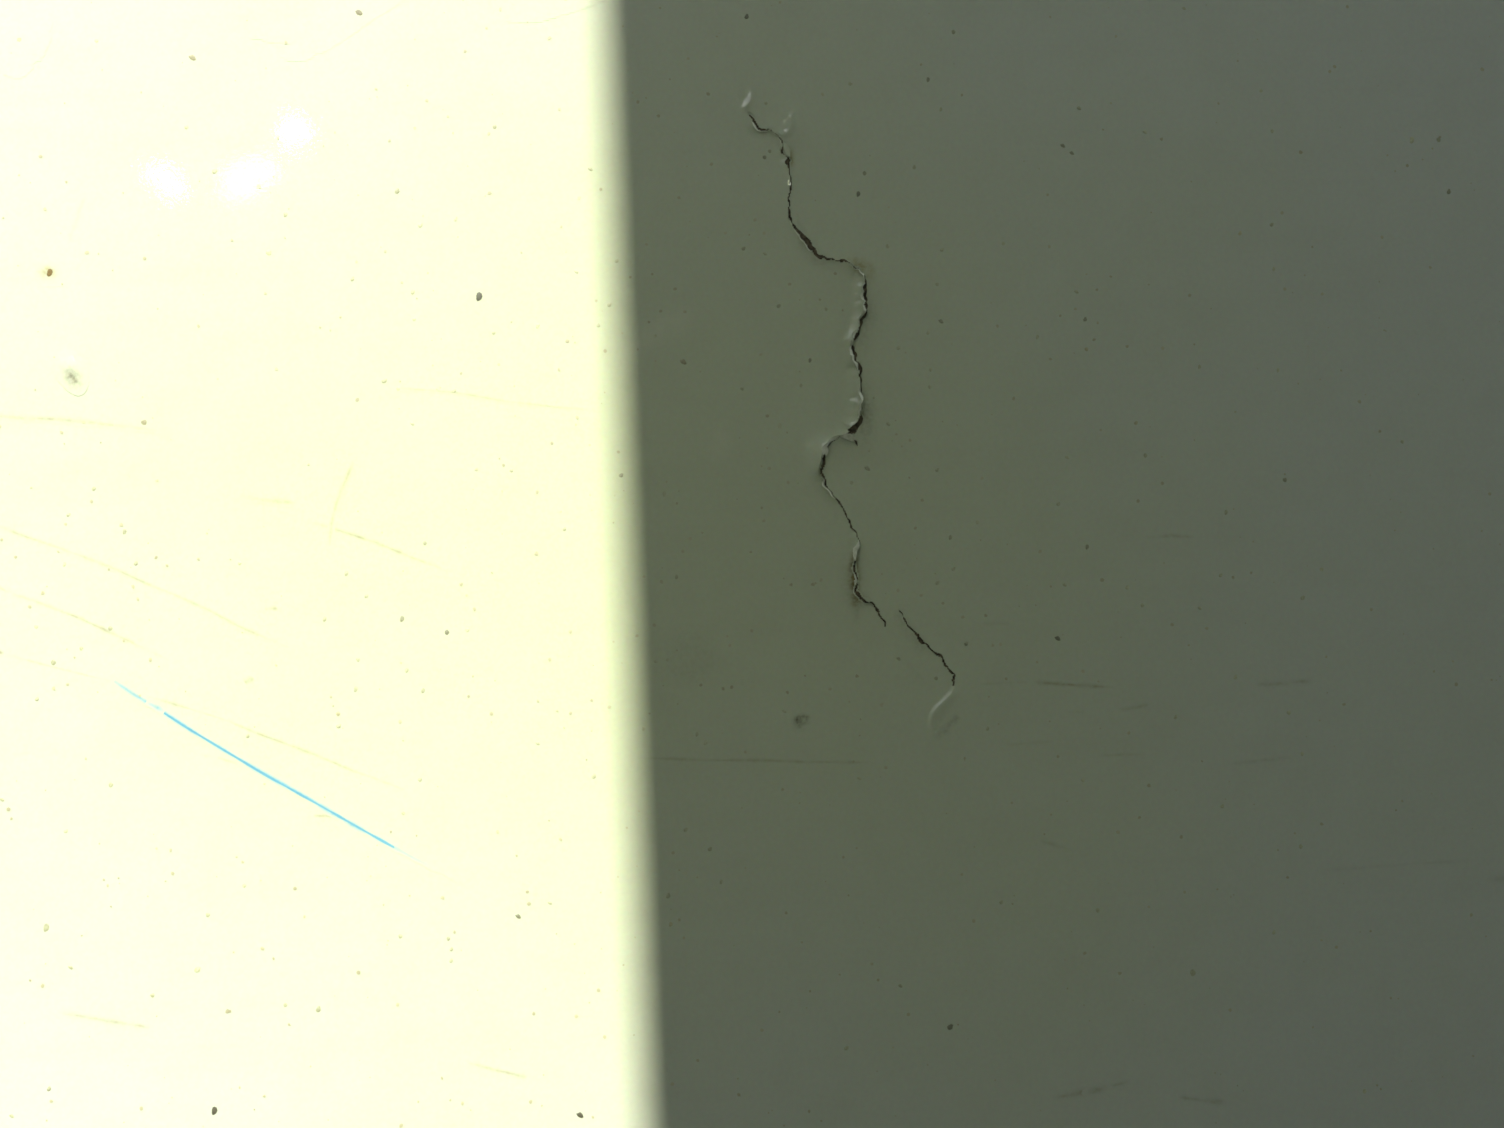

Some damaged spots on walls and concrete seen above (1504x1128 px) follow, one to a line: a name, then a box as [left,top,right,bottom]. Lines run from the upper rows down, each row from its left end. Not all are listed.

crack [724,90,981,746]